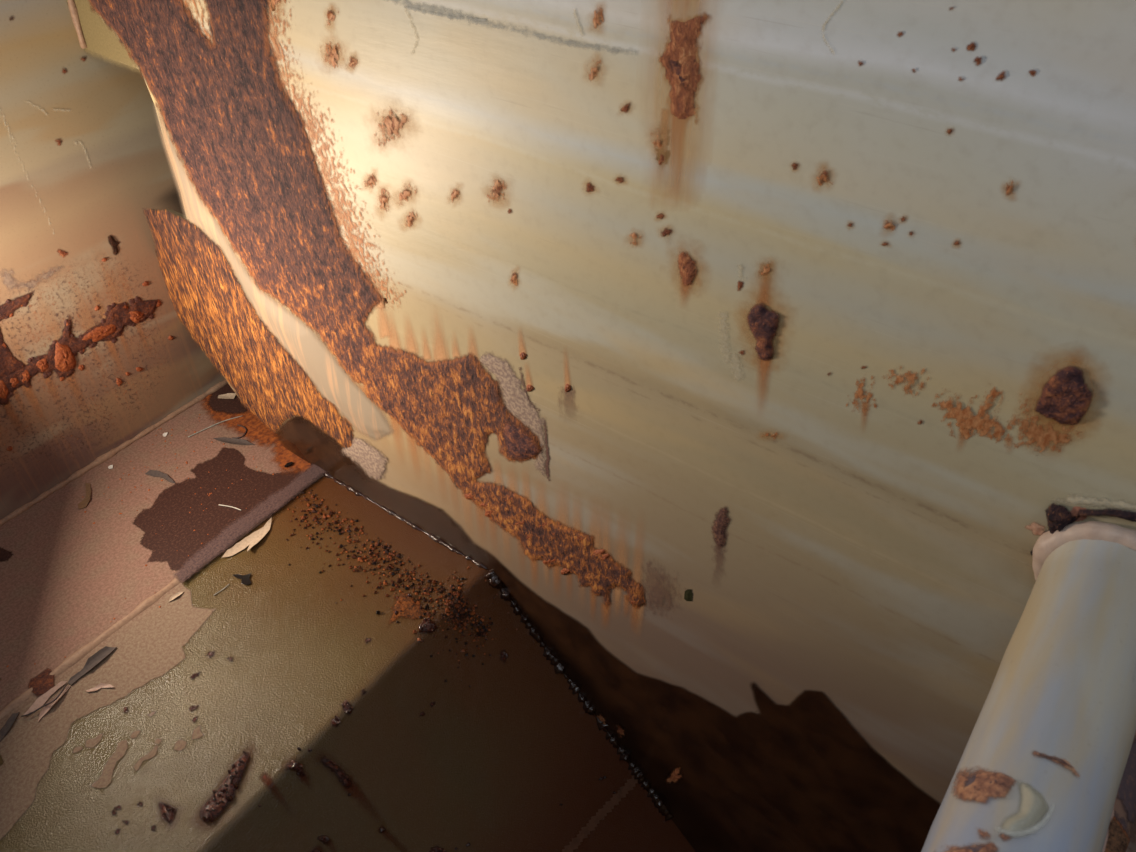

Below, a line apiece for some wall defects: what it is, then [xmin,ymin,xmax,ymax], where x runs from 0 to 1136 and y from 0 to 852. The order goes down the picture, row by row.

corrosion [653,0,708,181]
corrosion [2,236,149,362]
corrosion [89,0,645,616]
corrosion [678,252,697,292]
corrosion [739,294,779,381]
peeling [480,353,545,475]
corrosion [846,366,877,412]
corrosion [932,366,1092,453]
peeling [221,517,272,558]
corrosion [712,507,729,556]
peeling [0,646,117,742]
corrosion [199,751,249,822]